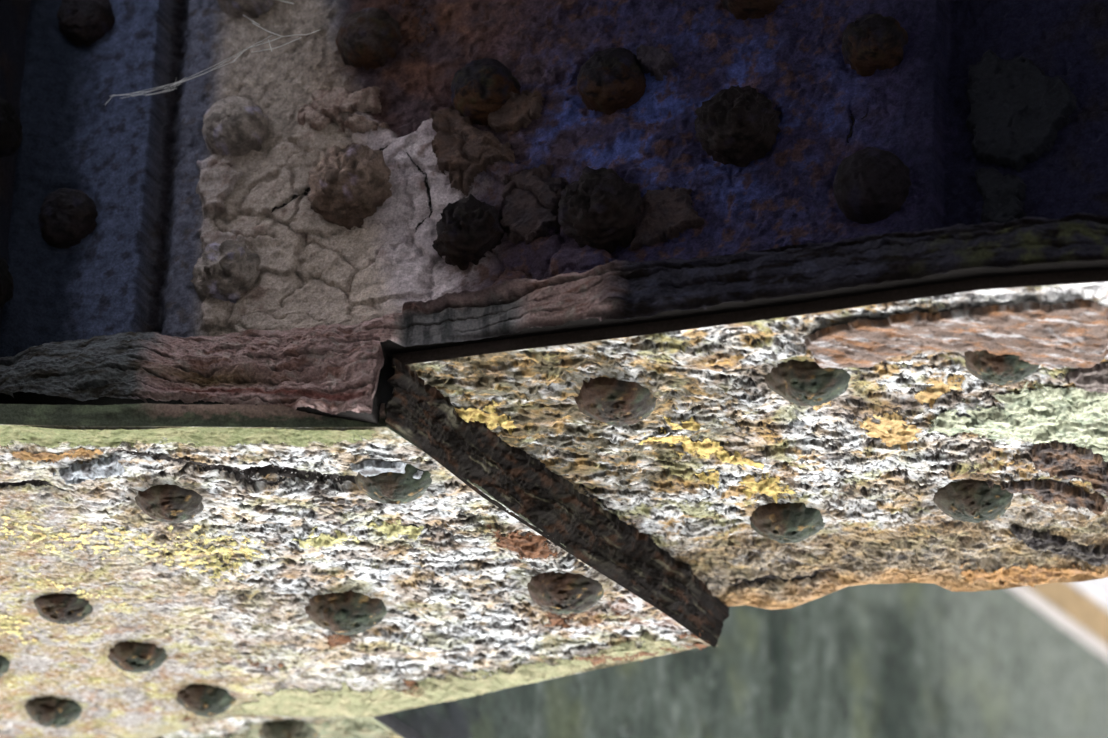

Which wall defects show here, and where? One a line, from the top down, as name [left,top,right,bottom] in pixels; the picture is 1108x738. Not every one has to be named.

peeling [803,298,1108,394]
corrosion [483,524,565,560]
corrosion [960,558,1105,587]
corrosion [542,612,576,629]